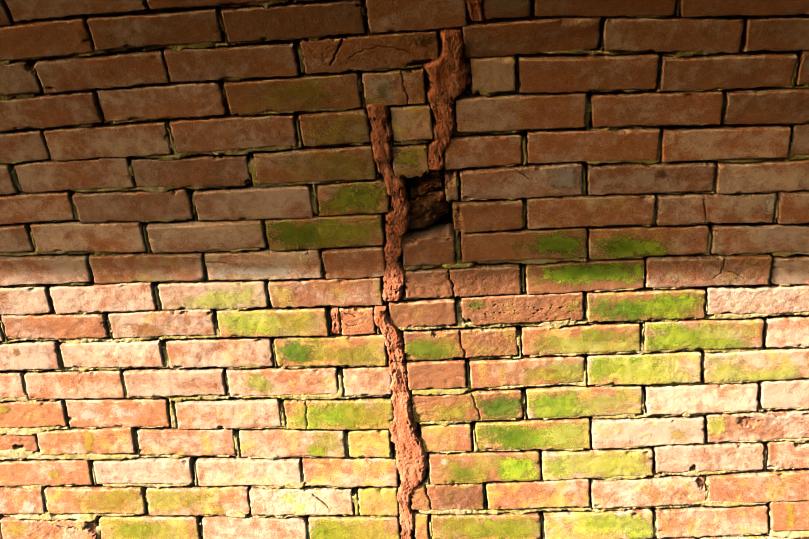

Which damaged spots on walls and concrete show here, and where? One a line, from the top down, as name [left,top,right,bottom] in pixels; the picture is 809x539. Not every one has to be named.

crack [401,0,485,170]
spalling [408,169,463,230]
water stain [209,265,291,279]
crack [330,306,347,334]
crack [366,104,432,539]